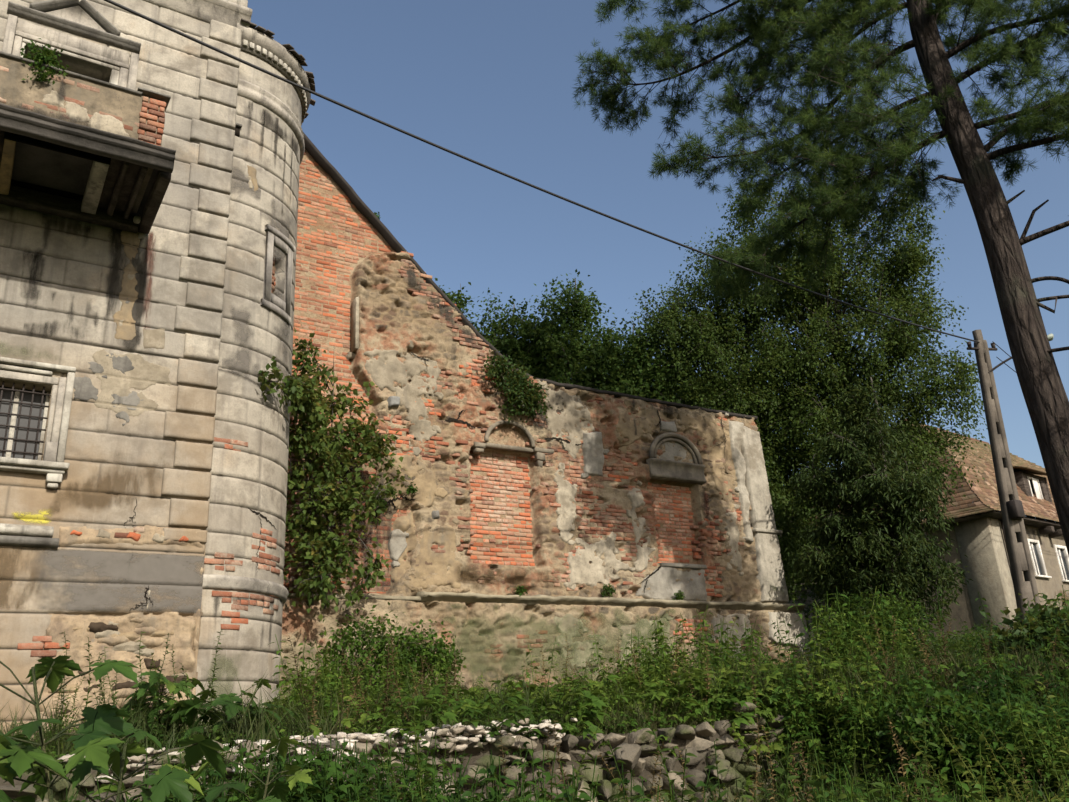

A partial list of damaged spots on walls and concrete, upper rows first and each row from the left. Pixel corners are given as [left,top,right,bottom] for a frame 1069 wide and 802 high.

damp [232,168,261,198]
damp [261,111,298,185]
damp [26,323,56,337]
damp [26,214,91,299]
damp [95,229,147,350]
flaking render [73,230,172,426]
flaking render [345,297,474,593]
flaking render [538,381,754,597]
crack [248,508,277,569]
crack [129,586,153,611]
flaking render [202,588,279,630]
spalling [17,603,203,737]